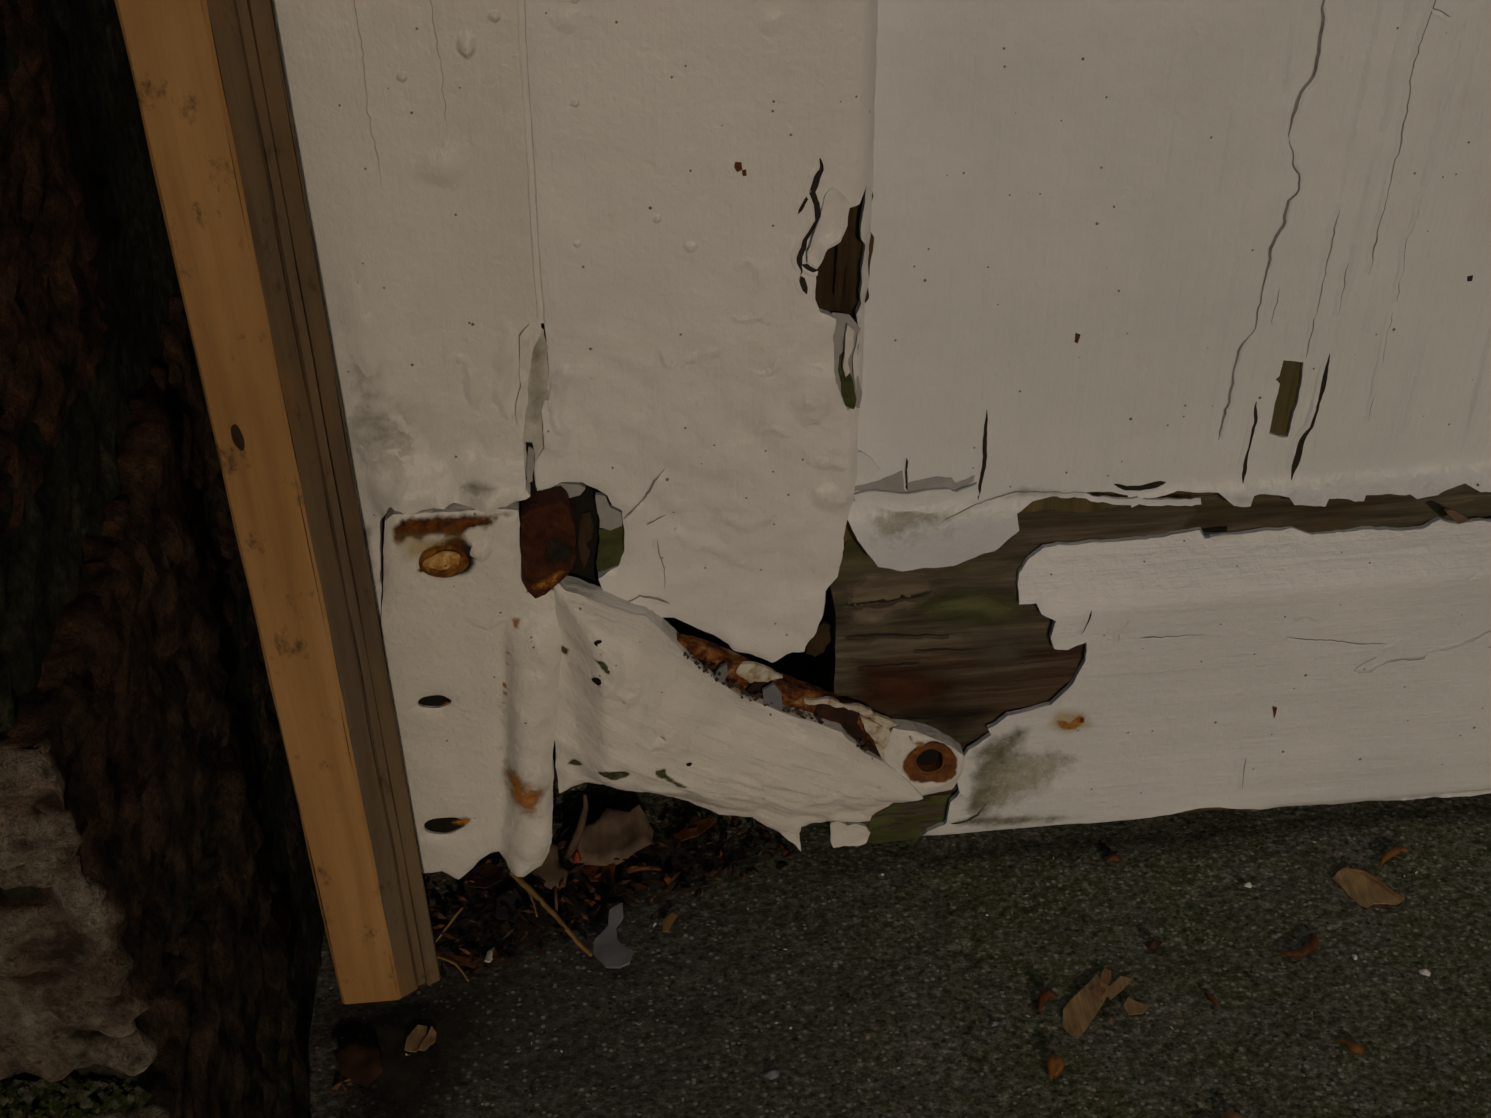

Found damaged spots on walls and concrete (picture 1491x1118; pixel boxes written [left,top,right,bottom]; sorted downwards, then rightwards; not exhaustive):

peeling [807,187,849,268]
crack [1218,0,1451,484]
peeling [832,313,862,409]
peeling [1270,360,1301,435]
crack [938,410,1201,530]
corrosion [394,516,497,574]
crack [1284,627,1491,673]
corrosion [745,681,783,700]
corrosion [814,699,881,757]
peeling [830,793,951,848]
corrosion [903,738,957,783]
leakage [961,755,1067,825]